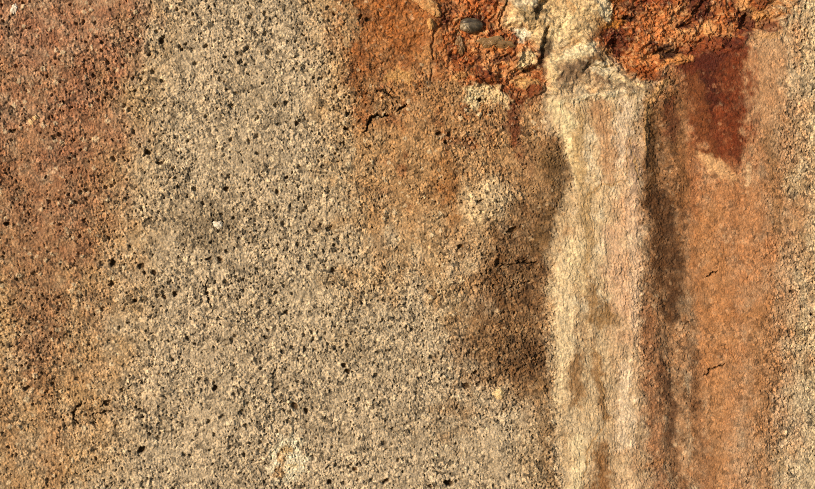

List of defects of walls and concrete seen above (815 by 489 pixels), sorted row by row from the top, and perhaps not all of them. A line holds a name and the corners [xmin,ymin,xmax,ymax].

corrosion [0,0,170,489]
spalling [333,0,541,117]
water stain [436,0,727,489]
spalling [598,0,813,83]
crack [703,363,726,376]
corrosion [682,7,815,489]